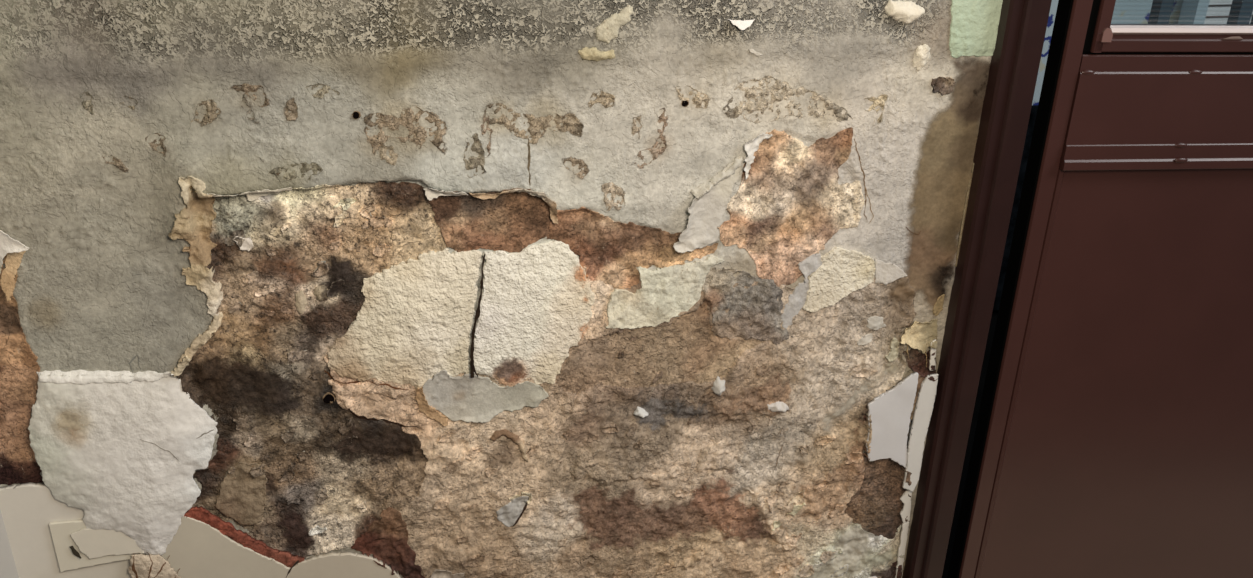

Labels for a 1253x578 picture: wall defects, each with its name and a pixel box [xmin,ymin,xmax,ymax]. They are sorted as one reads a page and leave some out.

damp [891,59,990,306]
flaking render [0,76,945,578]
crack [470,254,486,378]